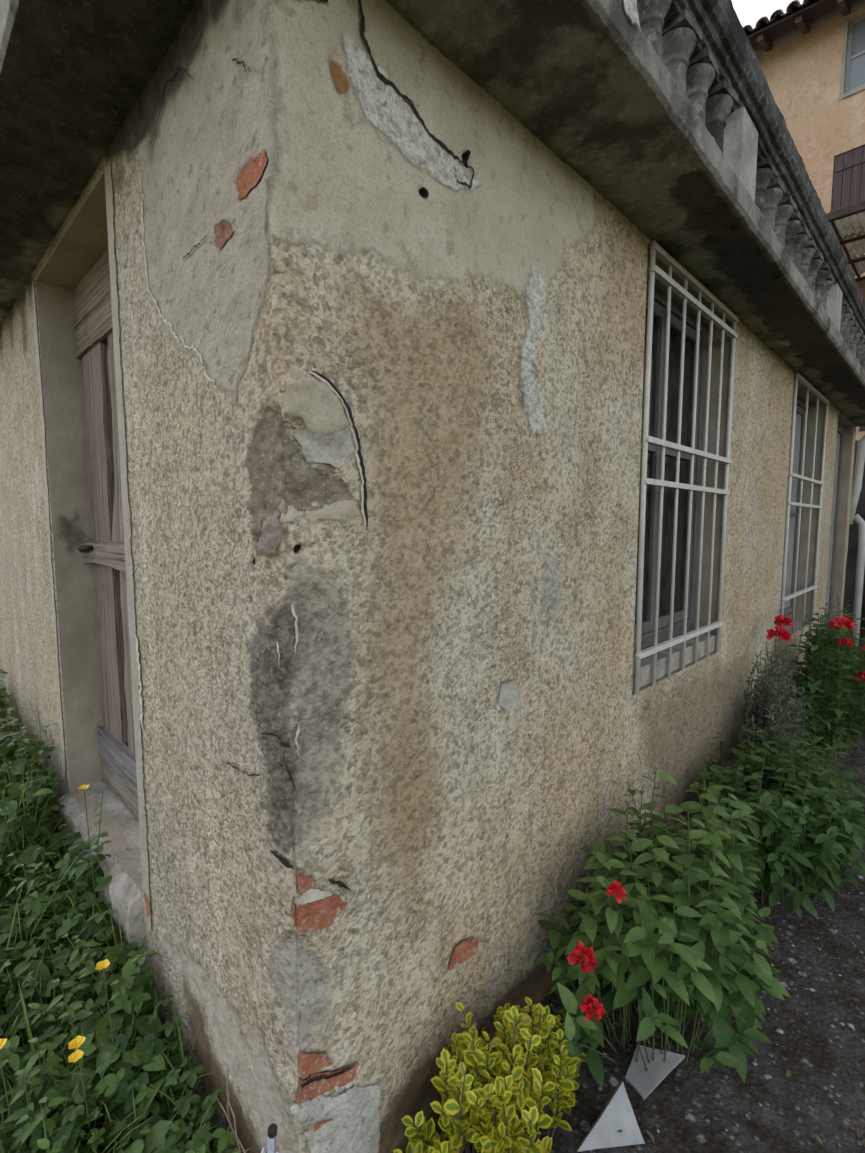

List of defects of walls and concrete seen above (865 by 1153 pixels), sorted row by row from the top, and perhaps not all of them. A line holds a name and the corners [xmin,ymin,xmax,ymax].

water stain [0,0,225,278]
peeling [139,0,596,393]
crack [343,0,480,190]
water stain [518,0,598,33]
spalling [244,375,356,565]
water stain [247,599,309,853]
flaking render [291,872,345,932]
flaking render [449,937,481,970]
spalling [291,1051,381,1153]